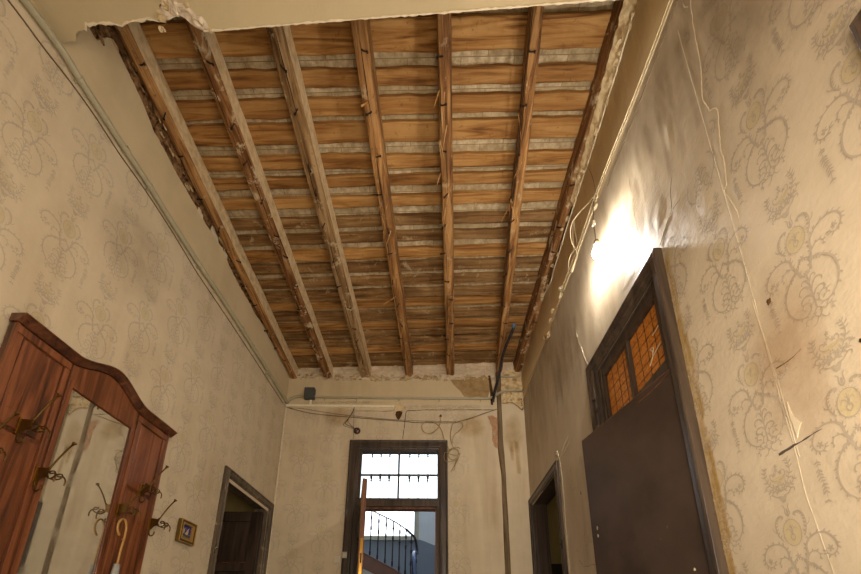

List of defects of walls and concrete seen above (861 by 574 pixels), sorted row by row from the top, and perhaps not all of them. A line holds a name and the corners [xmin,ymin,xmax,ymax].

spalling [84,0,637,345]
flaking render [290,362,524,411]